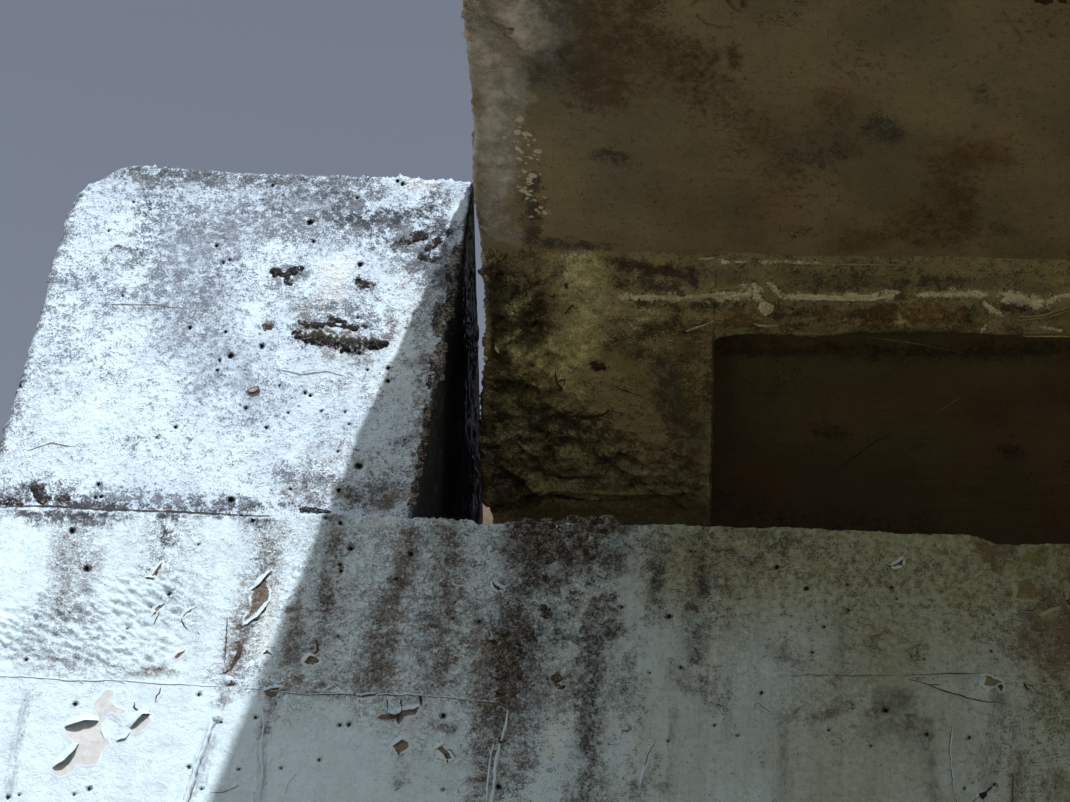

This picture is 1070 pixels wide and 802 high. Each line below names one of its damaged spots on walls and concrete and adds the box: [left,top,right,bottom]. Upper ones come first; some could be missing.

leakage [461,0,568,244]
spalling [291,314,389,355]
leakage [463,255,1070,802]
peeling [48,688,154,780]
peeling [223,617,243,673]
leakage [217,541,279,709]
peeling [242,569,276,626]
leakage [282,514,344,665]
peeling [353,691,422,758]
leakage [355,517,464,693]
peeling [433,741,456,763]
crack [791,672,1005,704]